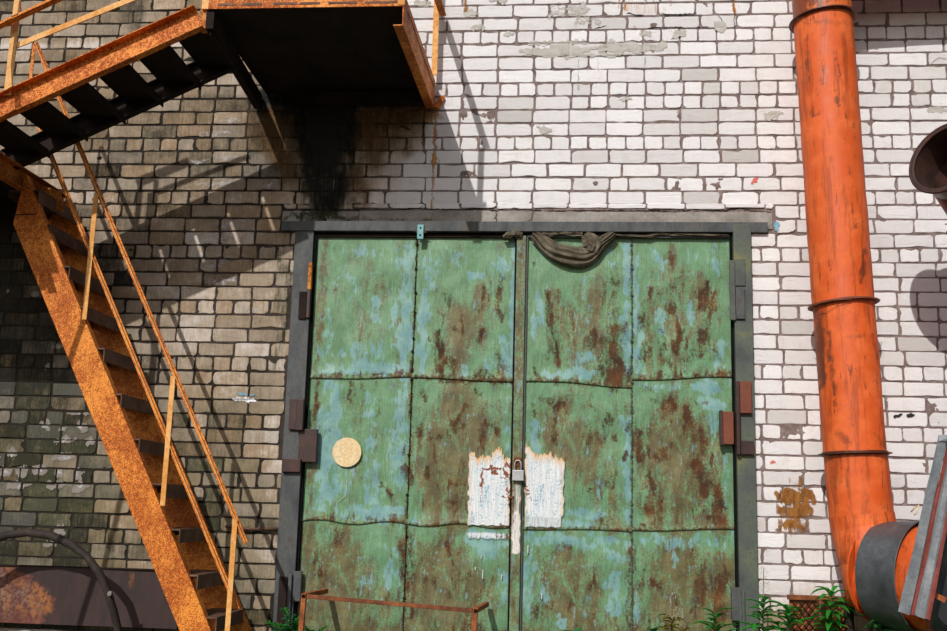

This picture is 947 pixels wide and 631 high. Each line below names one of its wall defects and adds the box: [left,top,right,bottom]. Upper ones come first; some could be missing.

peeling [528,39,622,58]
leakage [259,89,433,221]
corrosion [774,476,816,533]